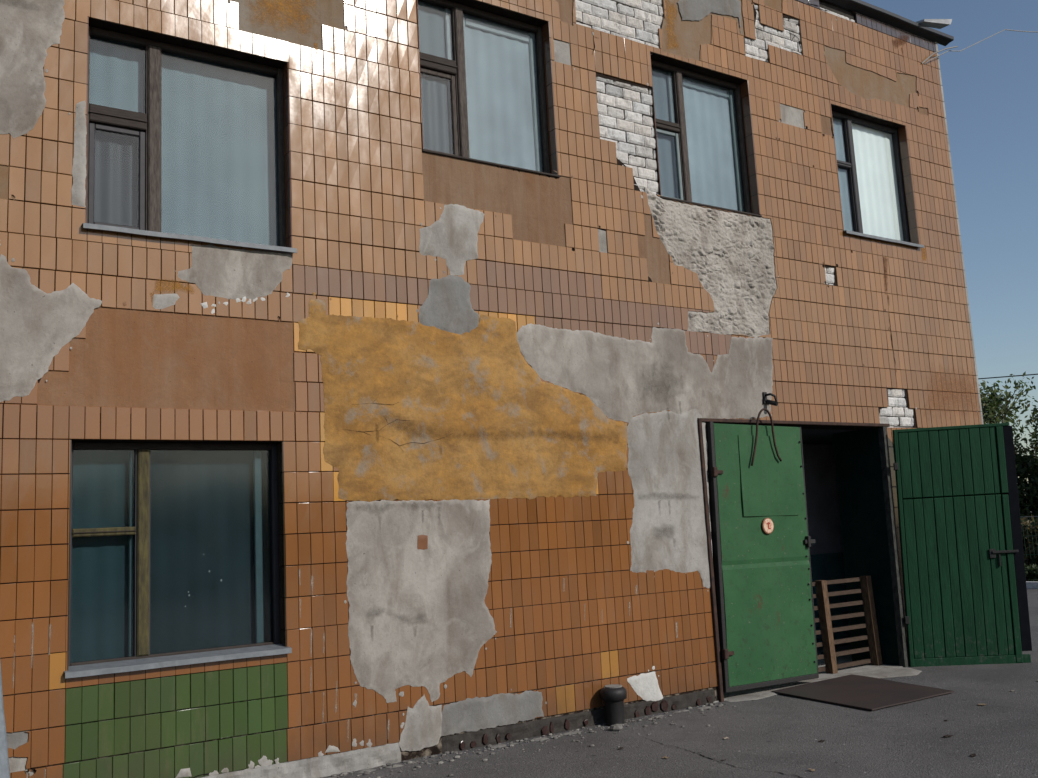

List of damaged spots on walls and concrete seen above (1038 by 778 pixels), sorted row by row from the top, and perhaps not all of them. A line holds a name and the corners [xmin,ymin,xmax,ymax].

spalling [227,0,350,50]
flaking render [556,0,802,62]
spalling [823,46,928,115]
spalling [422,152,574,247]
spalling [596,76,779,337]
spalling [21,296,302,415]
peeling [417,535,428,550]
spalling [624,666,715,719]
spalling [441,708,606,753]